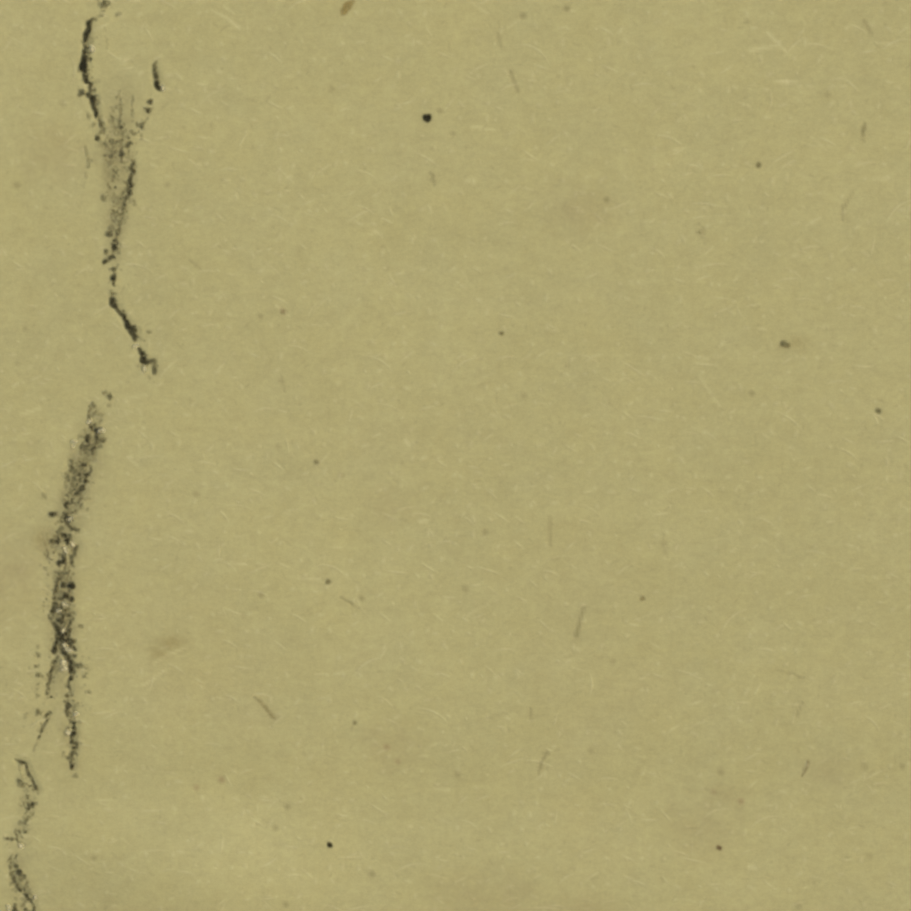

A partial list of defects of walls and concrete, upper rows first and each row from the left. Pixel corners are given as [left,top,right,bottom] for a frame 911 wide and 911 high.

crack [80,20,102,139]
crack [149,68,164,103]
crack [103,233,154,371]
crack [47,420,104,767]